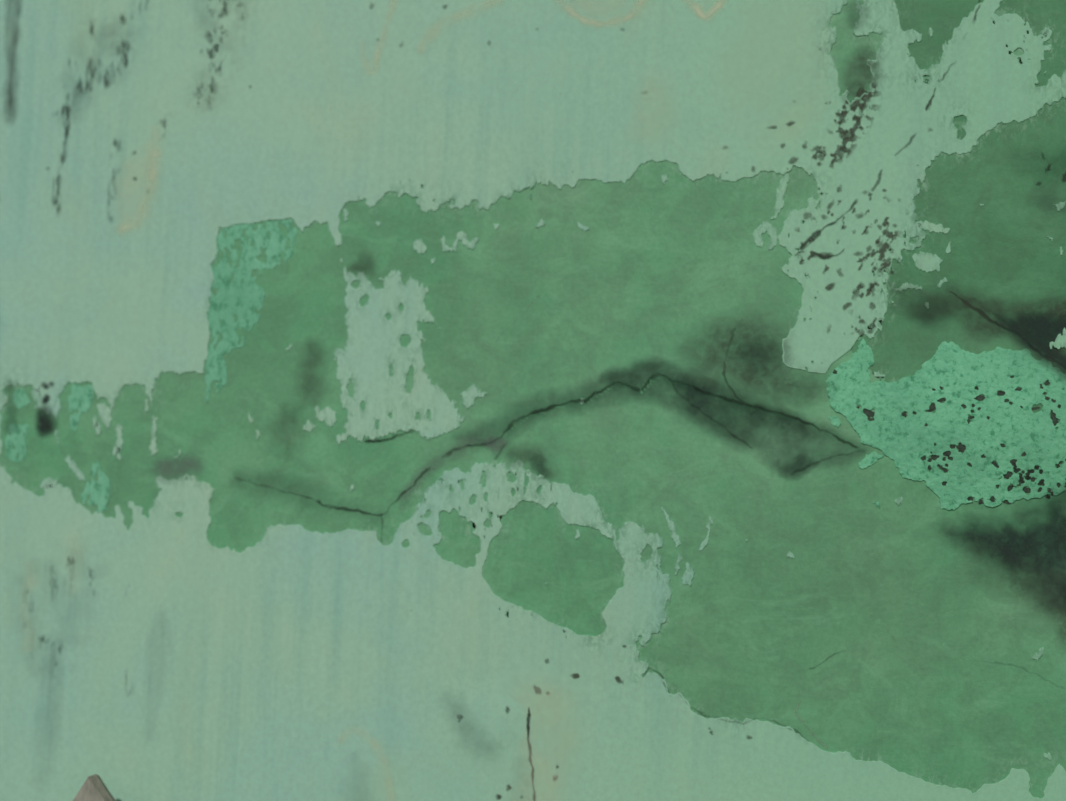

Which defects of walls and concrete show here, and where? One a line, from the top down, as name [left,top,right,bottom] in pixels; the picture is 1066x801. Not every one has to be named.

peeling [995,0,1066,87]
peeling [852,97,1066,383]
peeling [0,160,1066,799]
water stain [964,513,1066,608]
crack [527,710,535,801]